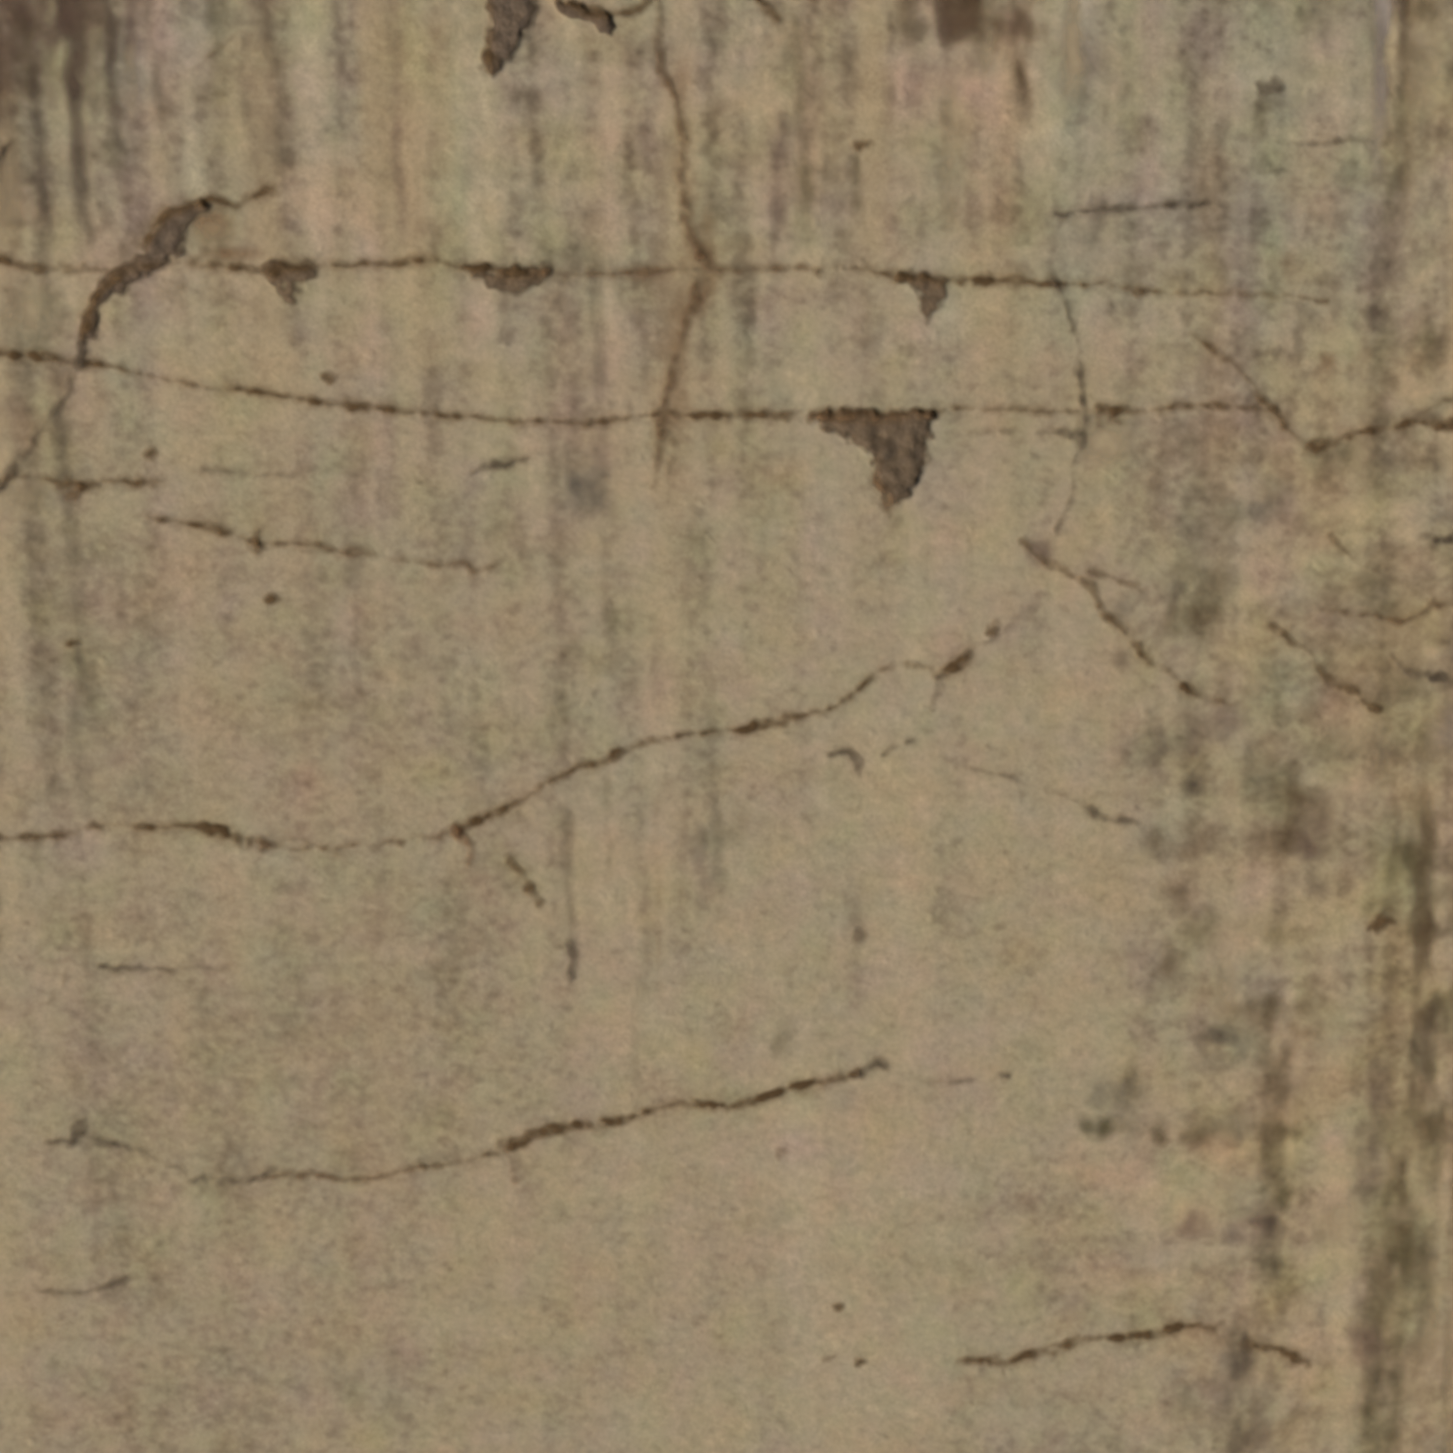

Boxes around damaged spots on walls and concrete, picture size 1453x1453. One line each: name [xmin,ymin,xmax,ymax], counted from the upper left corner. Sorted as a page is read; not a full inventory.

spalling [482,0,536,75]
spalling [555,0,615,35]
water stain [944,0,980,33]
water stain [1017,64,1026,88]
water stain [59,0,86,198]
spalling [470,263,551,294]
crack [879,272,1087,288]
spalling [810,408,935,510]
crack [135,822,271,848]
crack [695,1061,886,1109]
crack [484,1109,652,1156]
crack [962,1322,1211,1364]